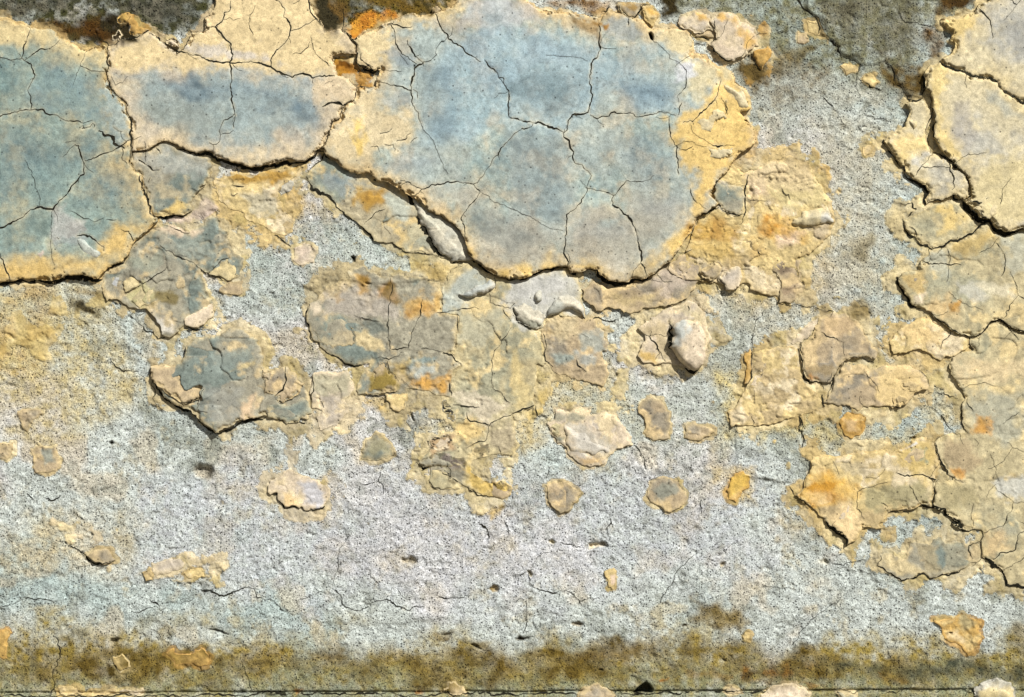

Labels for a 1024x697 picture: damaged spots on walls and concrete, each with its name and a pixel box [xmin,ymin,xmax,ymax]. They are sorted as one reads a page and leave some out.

flaking render [617,2,659,41]
flaking render [678,11,772,70]
flaking render [840,64,879,87]
water stain [979,1,1024,67]
crack [798,0,1024,349]
flaking render [862,99,970,204]
crack [0,0,903,455]
flaking render [101,142,835,502]
flaking render [727,311,970,439]
flaking render [268,468,330,511]
crack [790,370,1024,589]
flaking render [877,536,981,581]